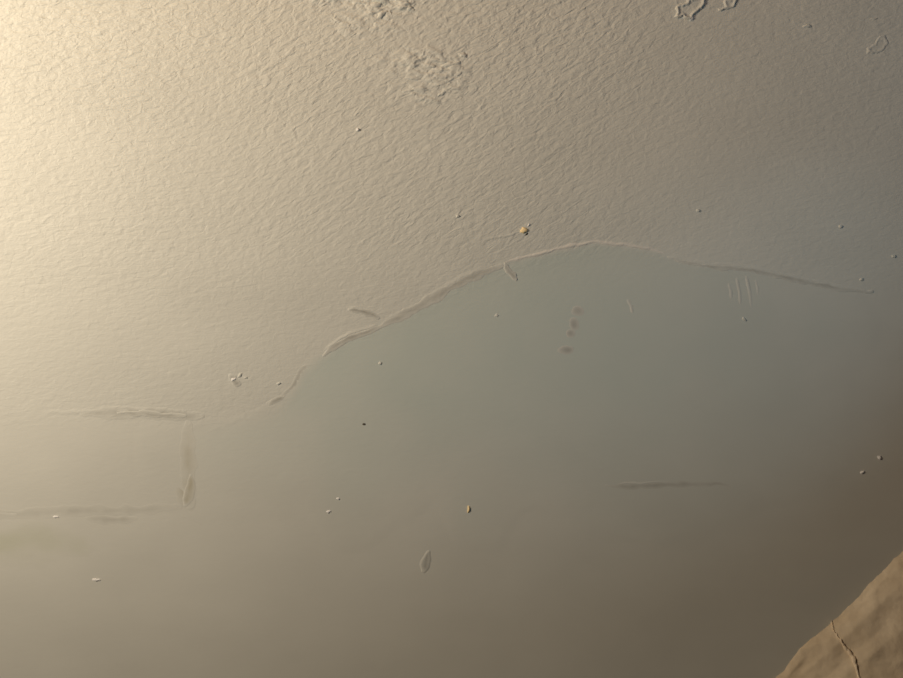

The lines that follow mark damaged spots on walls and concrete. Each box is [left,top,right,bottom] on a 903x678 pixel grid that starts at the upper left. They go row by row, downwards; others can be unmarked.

peeling [674,0,705,21]